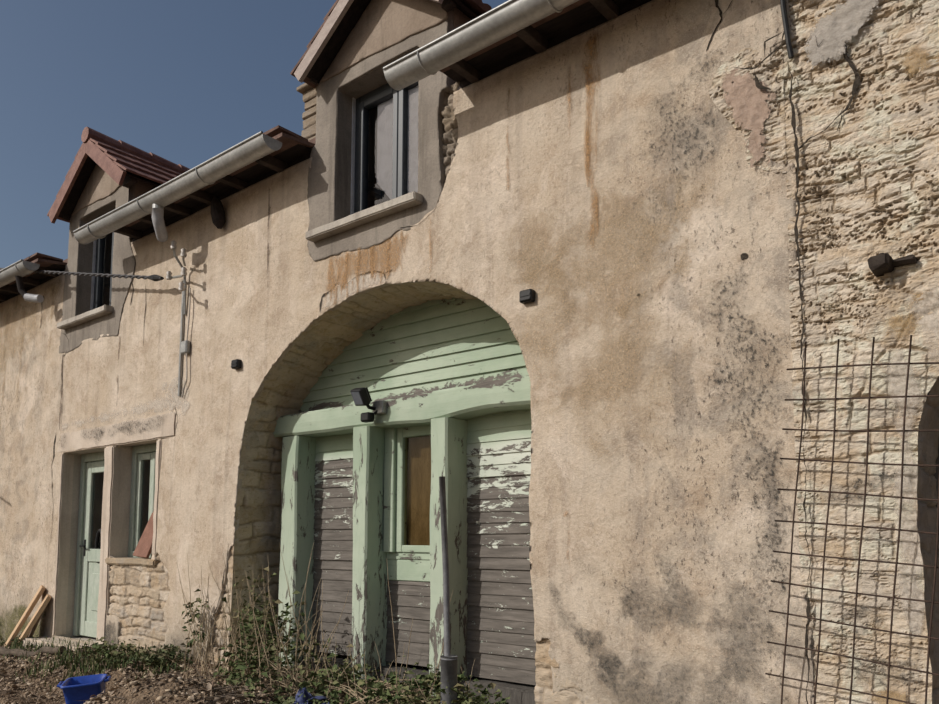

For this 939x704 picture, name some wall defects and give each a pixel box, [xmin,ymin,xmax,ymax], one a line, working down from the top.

crack [706,0,732,51]
flaking render [440,82,461,185]
corrosion [585,37,596,177]
water stain [649,93,715,193]
flaking render [709,45,787,174]
corrosion [328,236,403,301]
crack [733,32,883,704]
water stain [708,281,790,590]